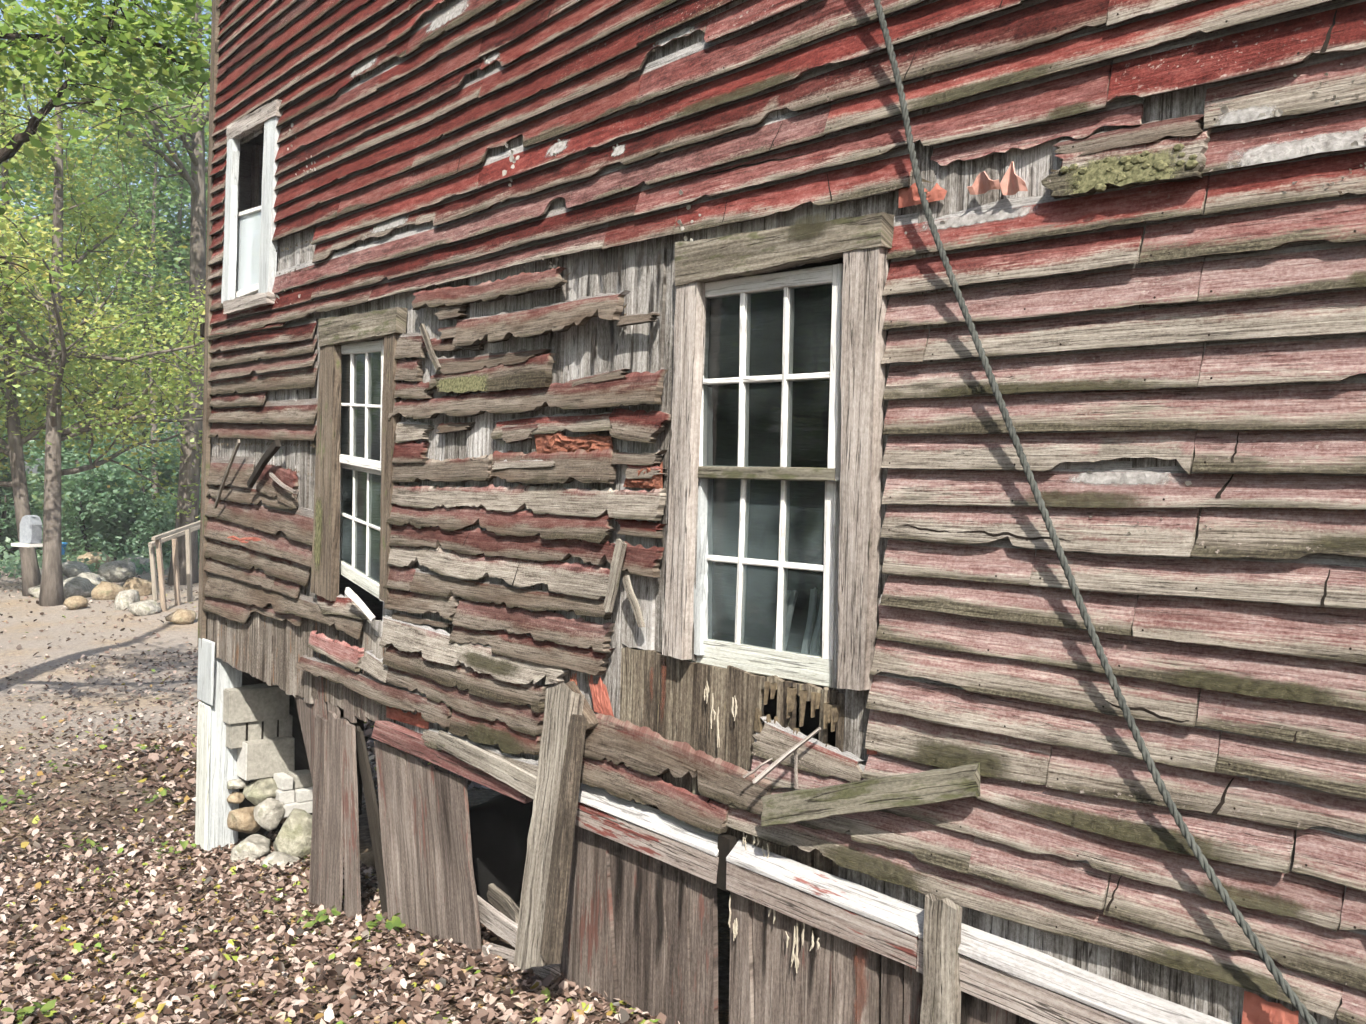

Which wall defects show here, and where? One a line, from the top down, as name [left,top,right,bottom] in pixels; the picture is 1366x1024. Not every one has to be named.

peeling [427,1,468,31]
peeling [1219,106,1283,125]
peeling [547,139,567,156]
peeling [612,144,625,156]
peeling [1240,127,1366,194]
peeling [923,161,1030,230]
peeling [1072,471,1168,484]
crack [1195,432,1239,498]
crack [900,525,1069,541]
crack [1320,569,1352,607]
crack [1185,778,1242,814]
crack [1105,876,1122,911]